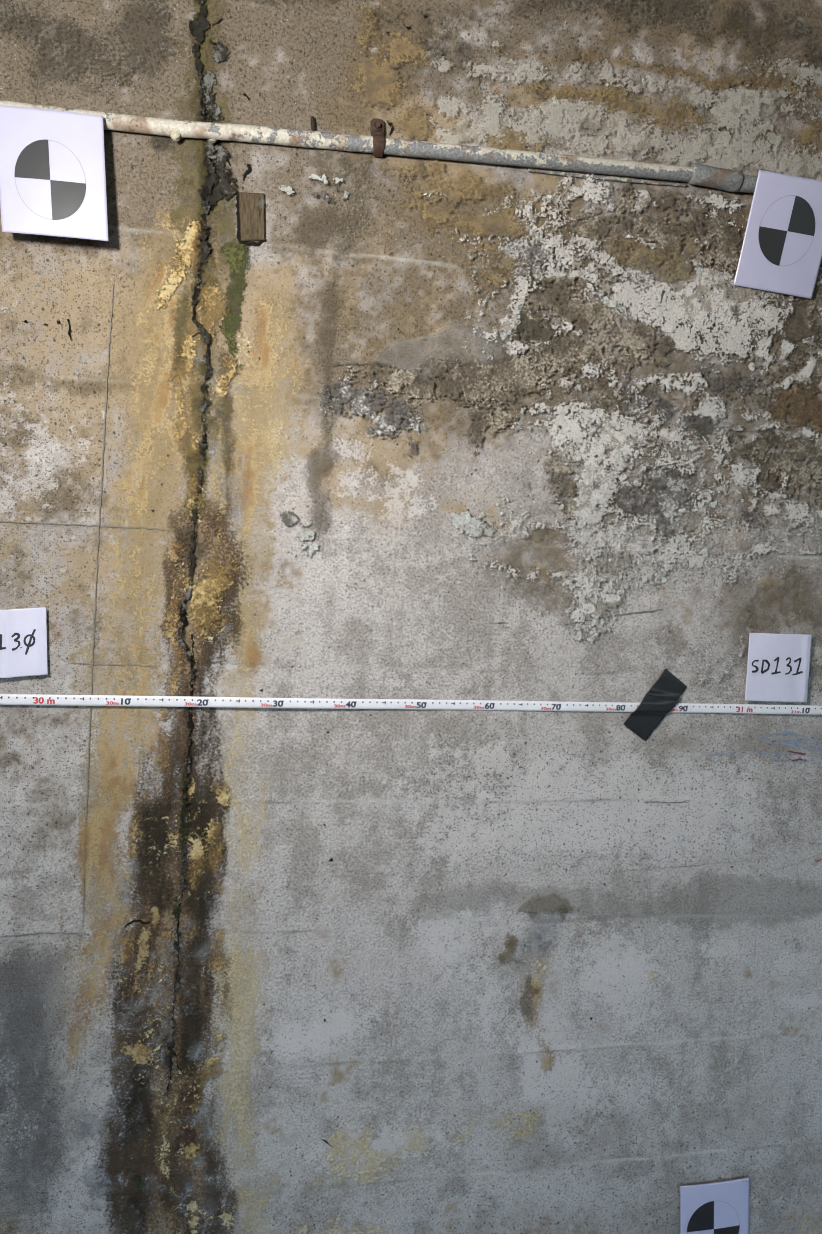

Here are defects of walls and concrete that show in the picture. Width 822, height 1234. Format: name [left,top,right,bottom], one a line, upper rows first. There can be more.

damp [190,138,218,189]
damp [180,0,240,123]
damp [0,209,284,1234]
crack [124,0,266,1096]
peeling [314,173,822,643]